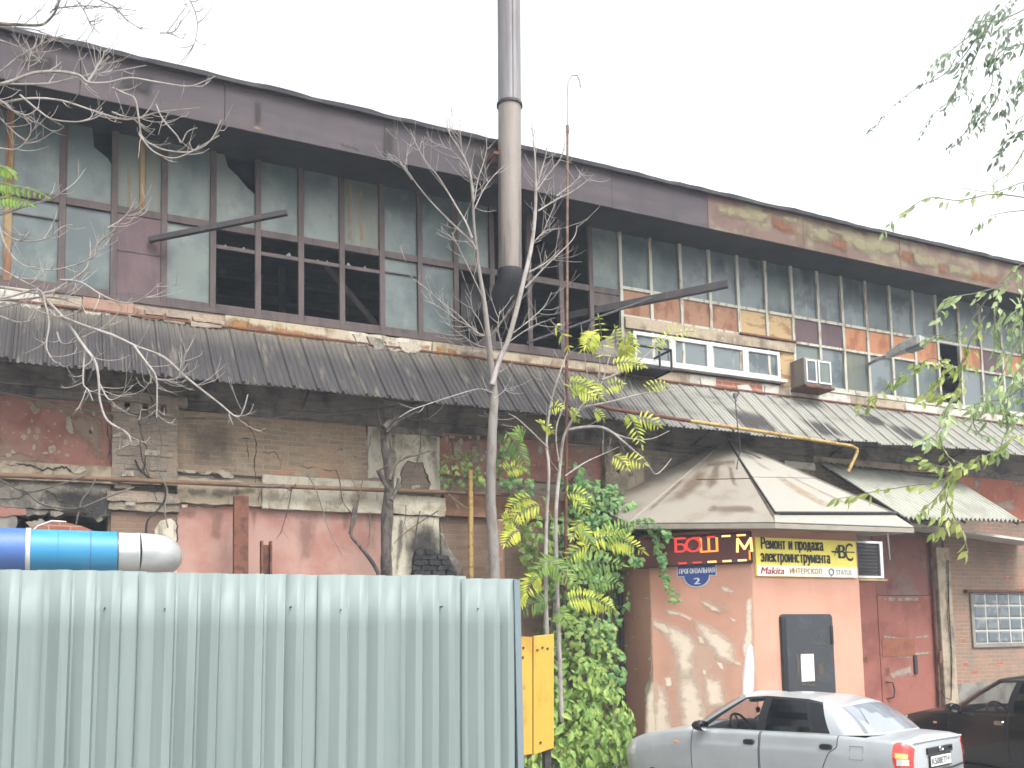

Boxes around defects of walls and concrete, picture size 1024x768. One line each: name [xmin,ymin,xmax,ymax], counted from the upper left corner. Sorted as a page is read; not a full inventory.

peeling [718,206,998,283]
spalling [134,308,222,329]
spalling [352,334,423,354]
crack [8,463,86,474]
peeling [0,401,239,542]
crack [240,421,355,505]
spalling [392,435,502,489]
peeling [644,598,754,733]